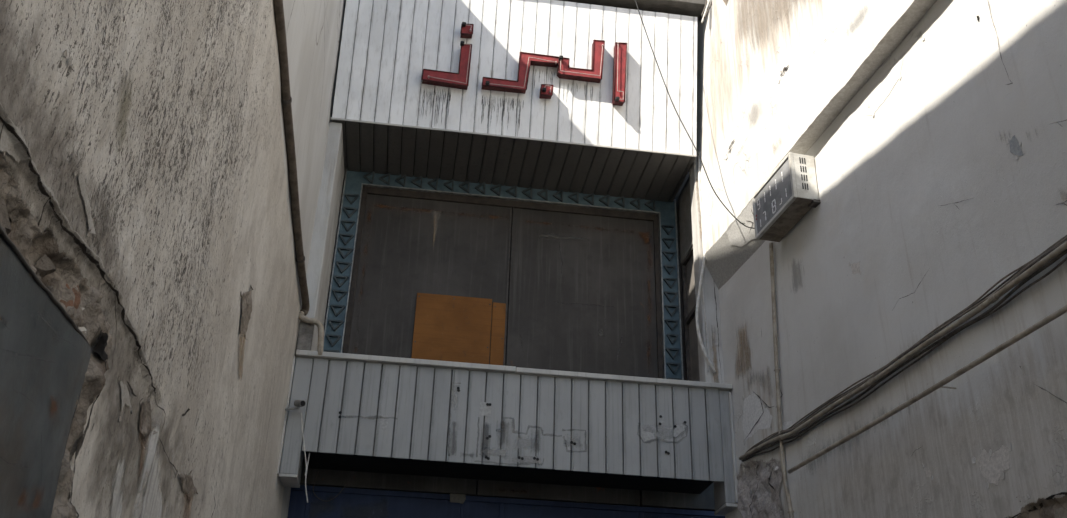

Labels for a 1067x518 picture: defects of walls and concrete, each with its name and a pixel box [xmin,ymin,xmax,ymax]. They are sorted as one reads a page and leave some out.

damp [421,89,451,126]
damp [481,96,524,136]
spalling [0,122,158,518]
flaking render [239,285,253,378]
peeling [742,392,794,445]
flaking render [175,470,198,504]
spalling [1006,494,1067,518]